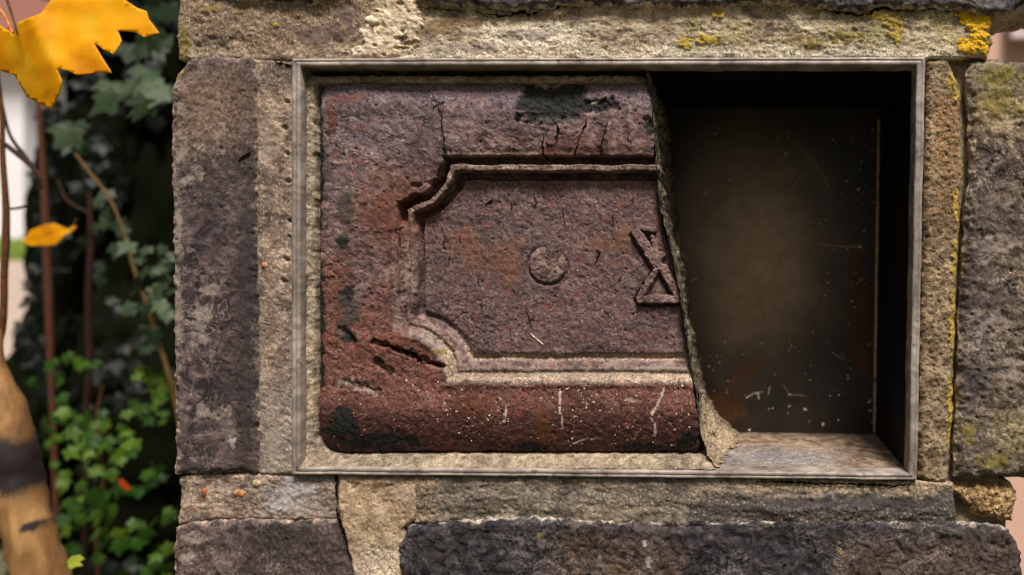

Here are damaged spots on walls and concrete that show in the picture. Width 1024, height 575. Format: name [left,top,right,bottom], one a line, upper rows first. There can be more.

crack [432,99,455,162]
crack [541,118,631,161]
crack [370,338,442,367]
leakage [326,404,419,451]